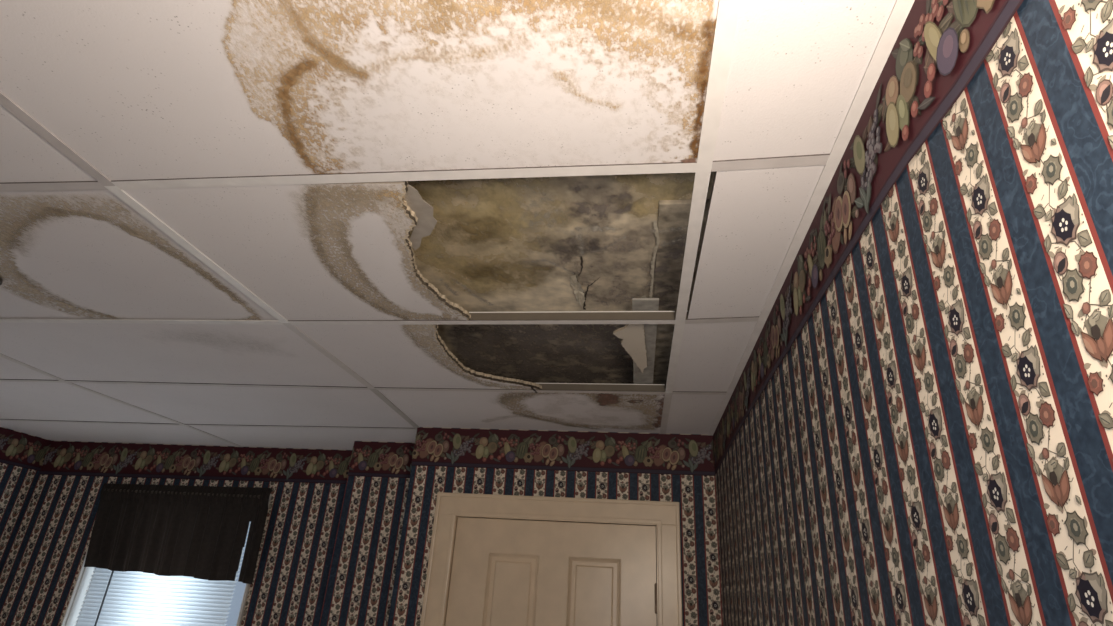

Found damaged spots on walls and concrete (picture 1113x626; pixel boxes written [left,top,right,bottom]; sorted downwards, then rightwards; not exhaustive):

damp [0,197,260,320]
damp [223,0,717,430]
spalling [613,324,647,373]